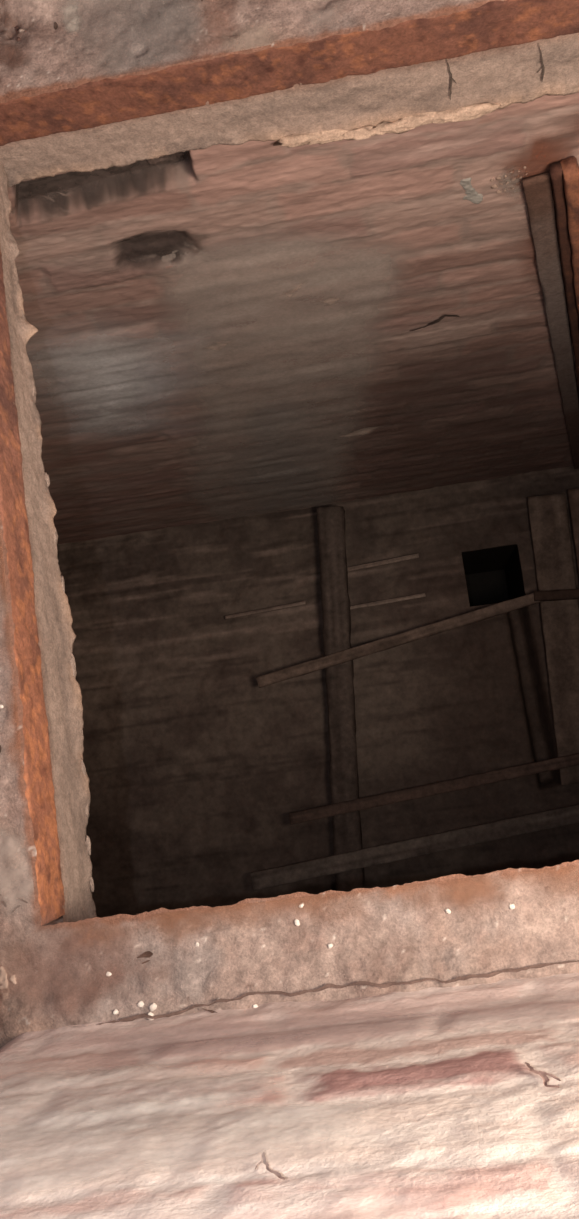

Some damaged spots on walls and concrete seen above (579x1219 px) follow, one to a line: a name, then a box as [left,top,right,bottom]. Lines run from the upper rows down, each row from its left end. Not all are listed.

spalling [273,103,501,147]
crack [83,961,578,1027]